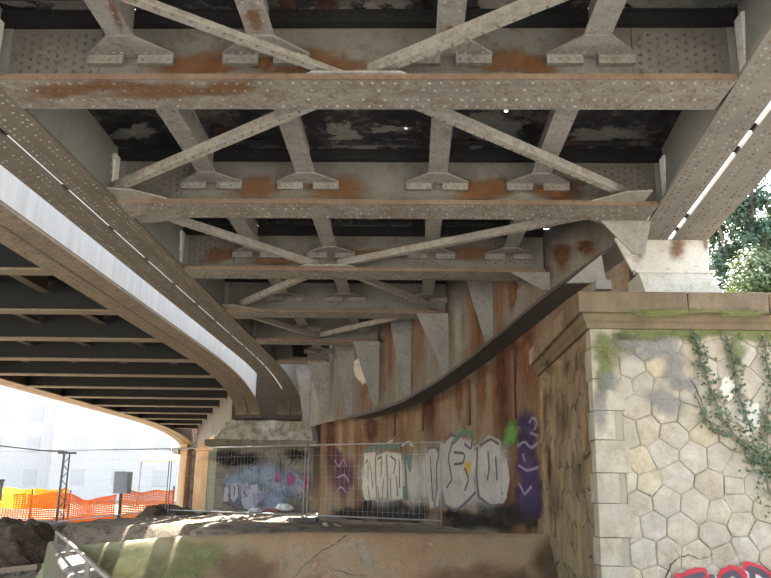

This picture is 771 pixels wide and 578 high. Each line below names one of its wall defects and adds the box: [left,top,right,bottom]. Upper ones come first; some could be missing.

peeling [276,0,434,9]
rust [30,53,250,98]
rust [482,51,555,73]
peeling [326,120,417,149]
peeling [464,109,530,140]
rust [310,178,361,199]
rust [460,179,512,200]
rust [533,181,584,200]
rust [672,240,684,256]
water stain [614,337,694,389]
crack [293,534,364,578]
water stain [537,545,557,578]